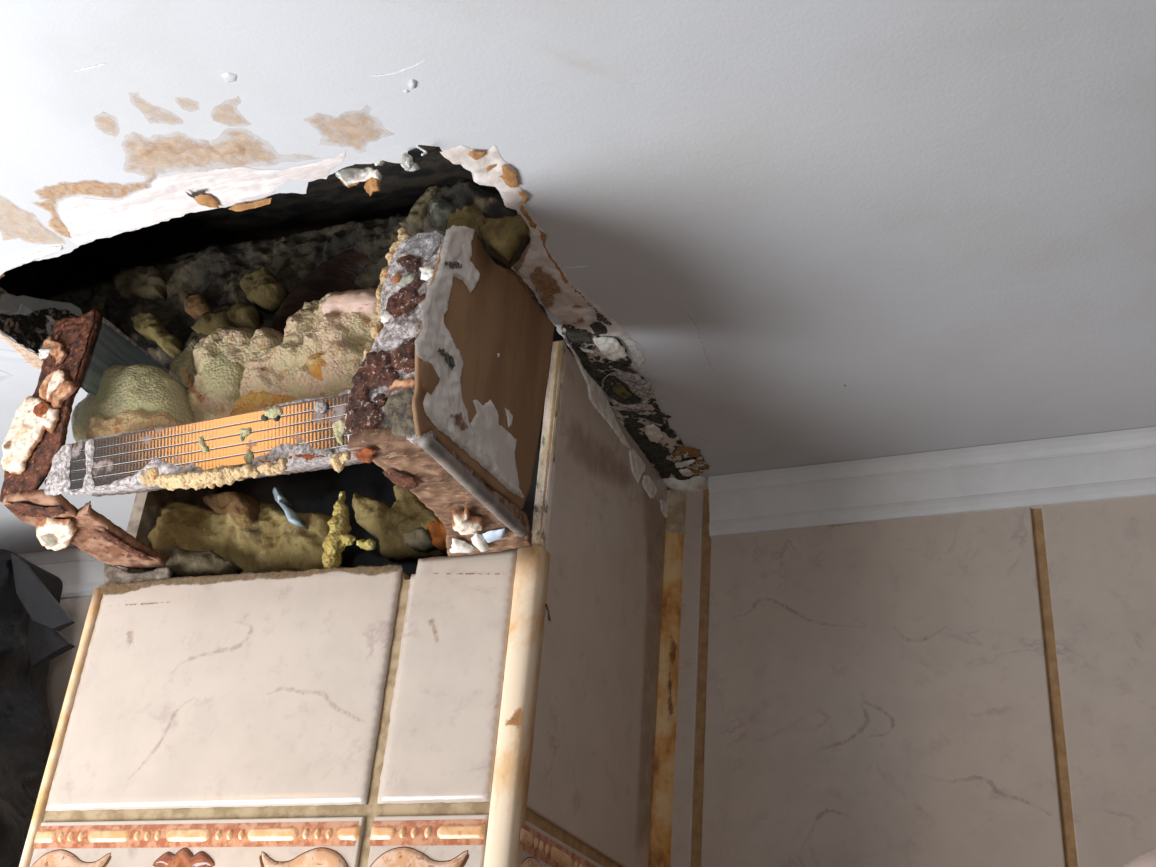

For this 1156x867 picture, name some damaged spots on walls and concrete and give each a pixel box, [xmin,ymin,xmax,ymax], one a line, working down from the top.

peeling [338,166,383,196]
flaking render [0,246,62,279]
rust [386,254,426,318]
peeling [440,145,631,340]
rust [39,308,94,382]
rust [33,401,48,418]
rust [344,336,417,437]
flaking render [420,361,440,395]
peeling [569,344,709,518]
rust [352,448,376,463]
rust [4,503,66,517]
flaking render [450,505,506,553]